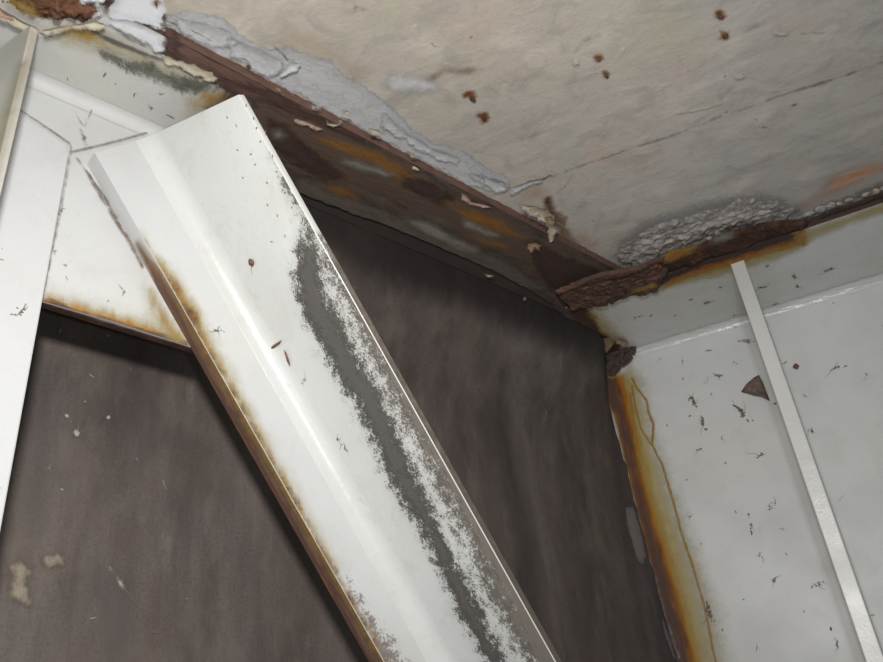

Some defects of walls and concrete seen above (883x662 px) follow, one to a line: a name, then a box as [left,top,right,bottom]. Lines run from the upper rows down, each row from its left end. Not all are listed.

peeling [0,0,542,208]
rust [163,26,623,353]
peeling [519,204,557,253]
rust [635,192,883,291]
rust [41,244,383,662]
leakage [278,176,606,662]
rust [607,371,717,662]